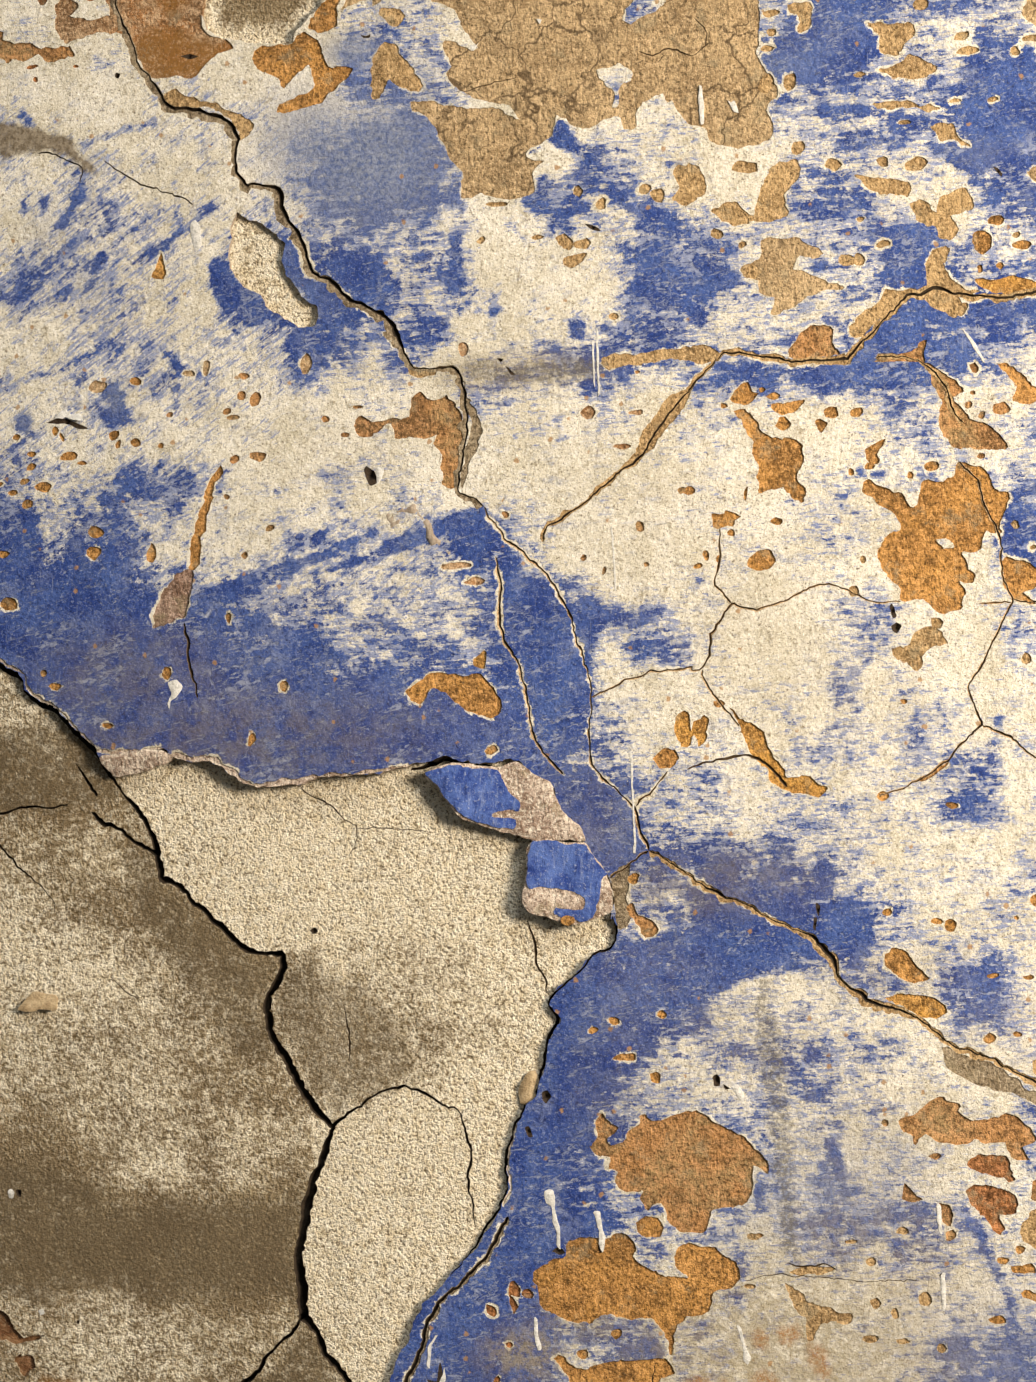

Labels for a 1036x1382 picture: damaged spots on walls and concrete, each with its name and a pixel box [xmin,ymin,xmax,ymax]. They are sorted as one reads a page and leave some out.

crack [38,152,193,205]
peeling [0,0,891,328]
peeling [788,156,1036,359]
crack [110,0,1036,1087]
peeling [711,382,806,536]
peeling [848,340,1036,671]
crack [0,663,618,1382]
spalling [0,650,659,1382]
leakage [0,1171,296,1302]
peeling [486,1110,769,1382]
crack [745,1263,917,1282]
peeling [881,1096,1036,1301]